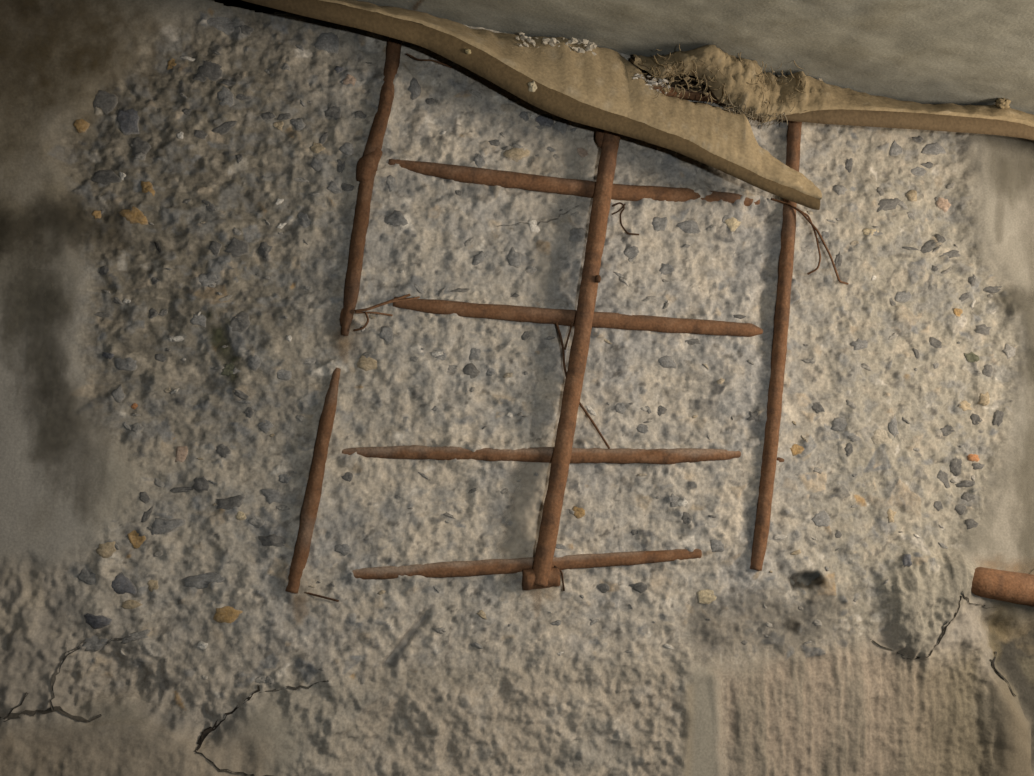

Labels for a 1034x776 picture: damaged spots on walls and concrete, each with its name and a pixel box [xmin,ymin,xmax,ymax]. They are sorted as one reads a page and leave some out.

spalling [339,37,601,336]
water stain [5,268,70,338]
spalling [393,299,577,347]
spalling [522,129,621,590]
spalling [592,312,763,337]
spalling [750,204,796,571]
spalling [342,445,554,463]
crack [870,591,999,659]
crack [0,631,143,722]
crack [194,680,329,776]
spalling [268,662,687,776]
spalling [720,646,995,776]